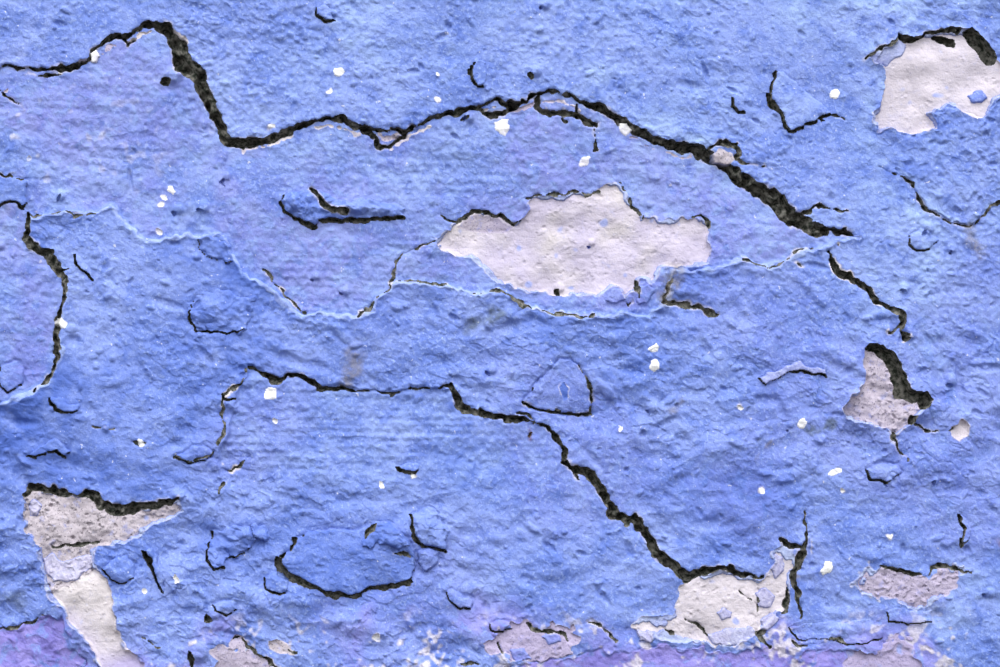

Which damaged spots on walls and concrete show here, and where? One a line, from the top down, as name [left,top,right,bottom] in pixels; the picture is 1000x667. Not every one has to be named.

crack [22,210,96,393]
peeling [0,28,862,414]
crack [0,20,911,337]
crack [173,366,764,583]
spalling [843,343,934,435]
spalling [865,26,1000,226]
crack [892,172,1000,228]
spalling [22,483,184,667]
crack [526,622,569,642]
spalling [631,543,795,649]
crack [755,511,848,649]
flaking render [788,561,968,667]